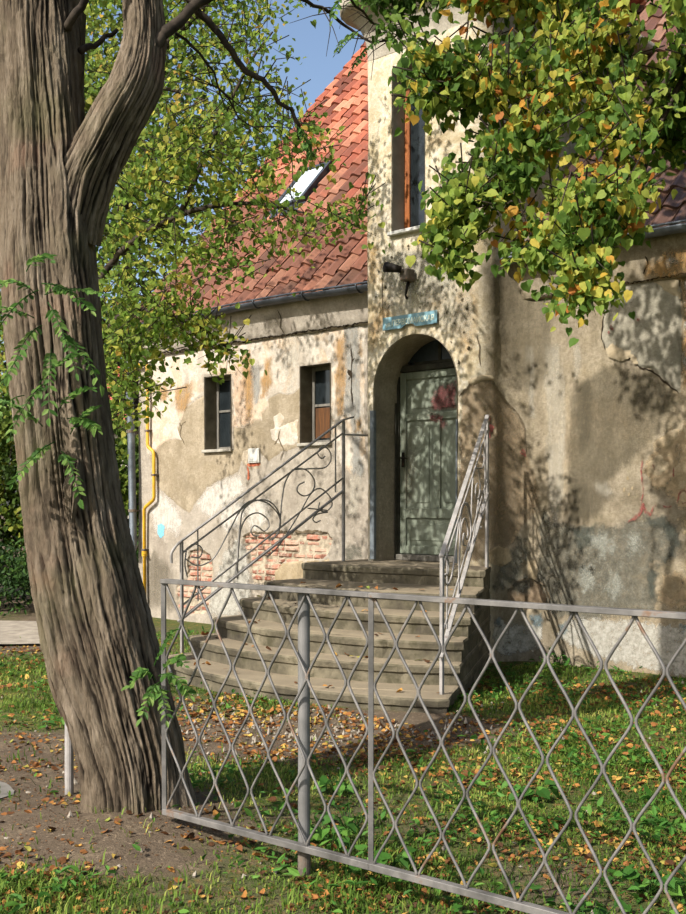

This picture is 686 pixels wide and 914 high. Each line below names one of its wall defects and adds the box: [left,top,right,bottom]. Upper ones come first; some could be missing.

crack [161,283,383,405]
peeling [601,279,682,394]
peeling [145,325,366,513]
leakage [493,374,681,621]
peeling [642,427,686,521]
spalling [176,547,214,615]
spalling [242,530,333,584]